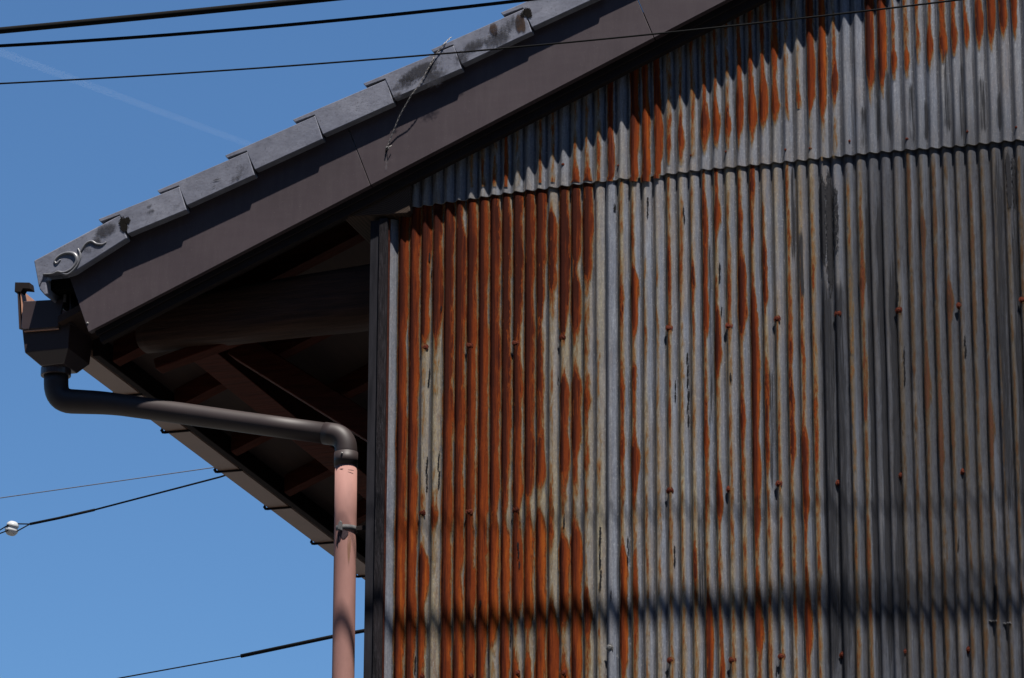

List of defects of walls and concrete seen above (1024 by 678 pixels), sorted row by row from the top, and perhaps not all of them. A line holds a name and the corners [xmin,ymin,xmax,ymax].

corrosion [864,0,1018,103]
corrosion [392,0,839,678]
corrosion [846,173,874,678]
corrosion [896,151,1024,678]